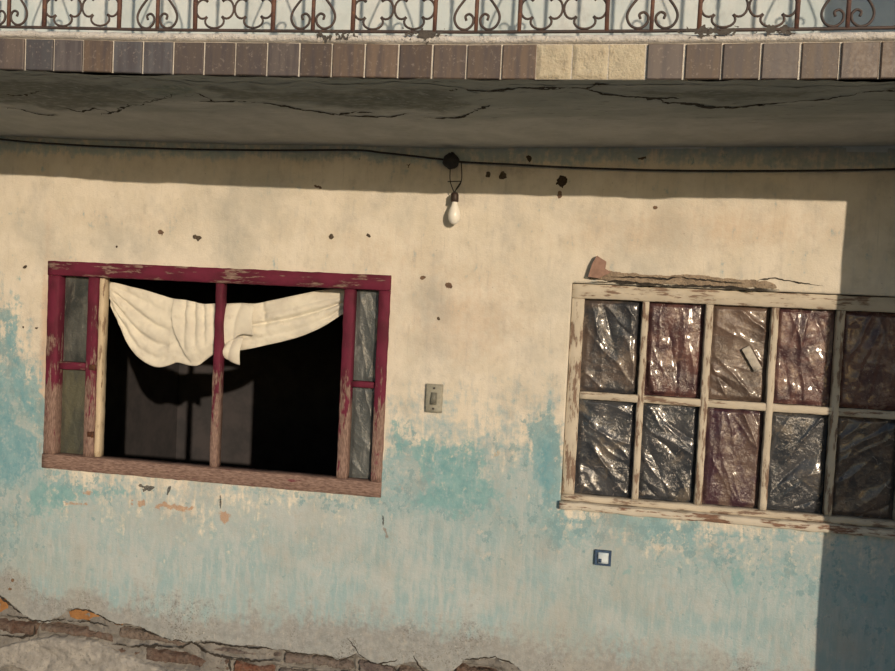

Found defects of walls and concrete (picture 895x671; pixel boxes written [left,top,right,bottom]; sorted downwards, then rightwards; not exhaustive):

crack [3,83,895,119]
peeling [0,267,147,522]
peeling [386,414,506,527]
peeling [524,429,563,513]
flaking render [0,588,429,671]